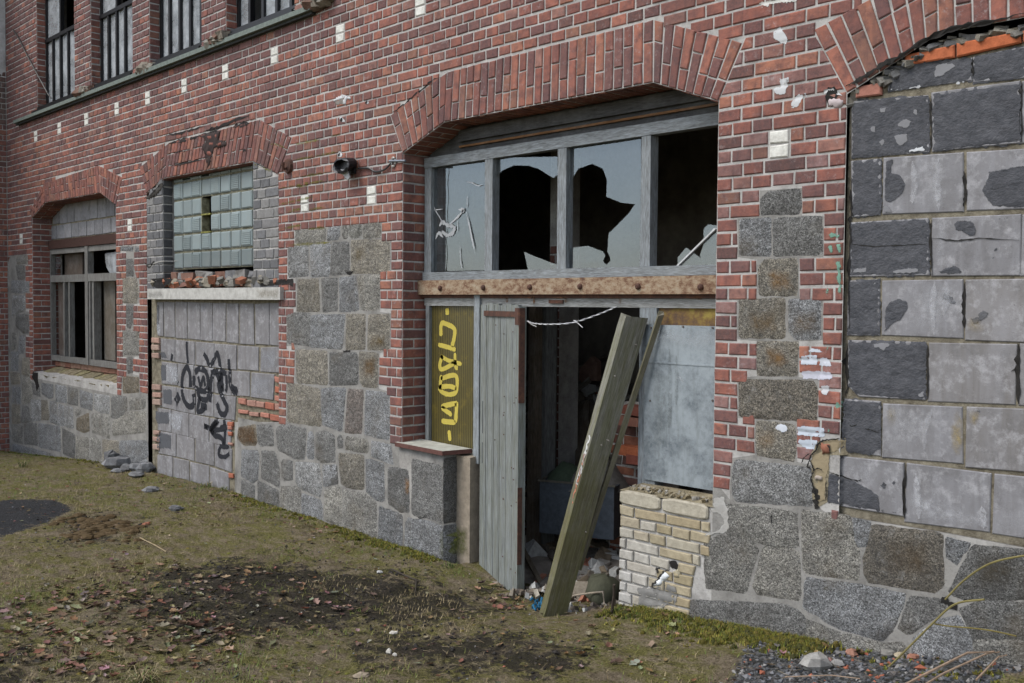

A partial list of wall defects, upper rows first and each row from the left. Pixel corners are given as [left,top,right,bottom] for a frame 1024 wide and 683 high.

spalling [201,130,227,168]
spalling [151,269,293,288]
spalling [811,46,1024,513]